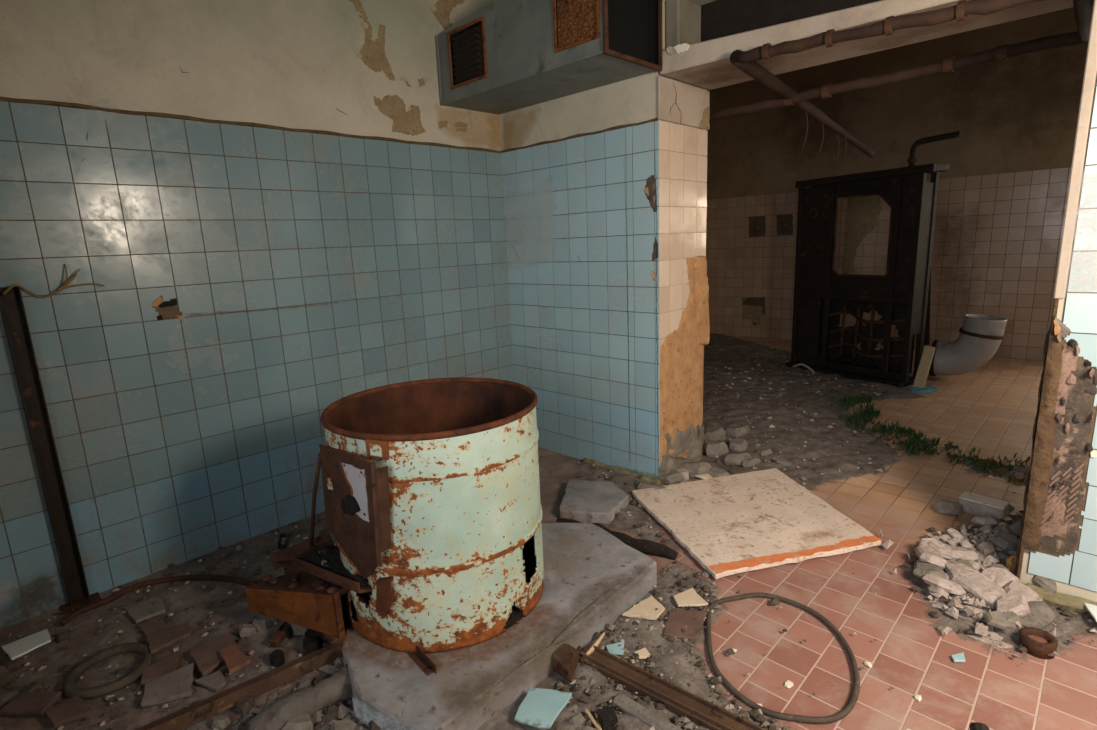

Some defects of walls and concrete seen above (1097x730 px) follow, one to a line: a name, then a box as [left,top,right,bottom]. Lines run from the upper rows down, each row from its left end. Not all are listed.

peeling [348,0,428,87]
peeling [430,0,465,30]
peeling [374,95,426,136]
spalling [151,296,185,321]
spalling [659,256,710,485]
spalling [958,318,1097,576]